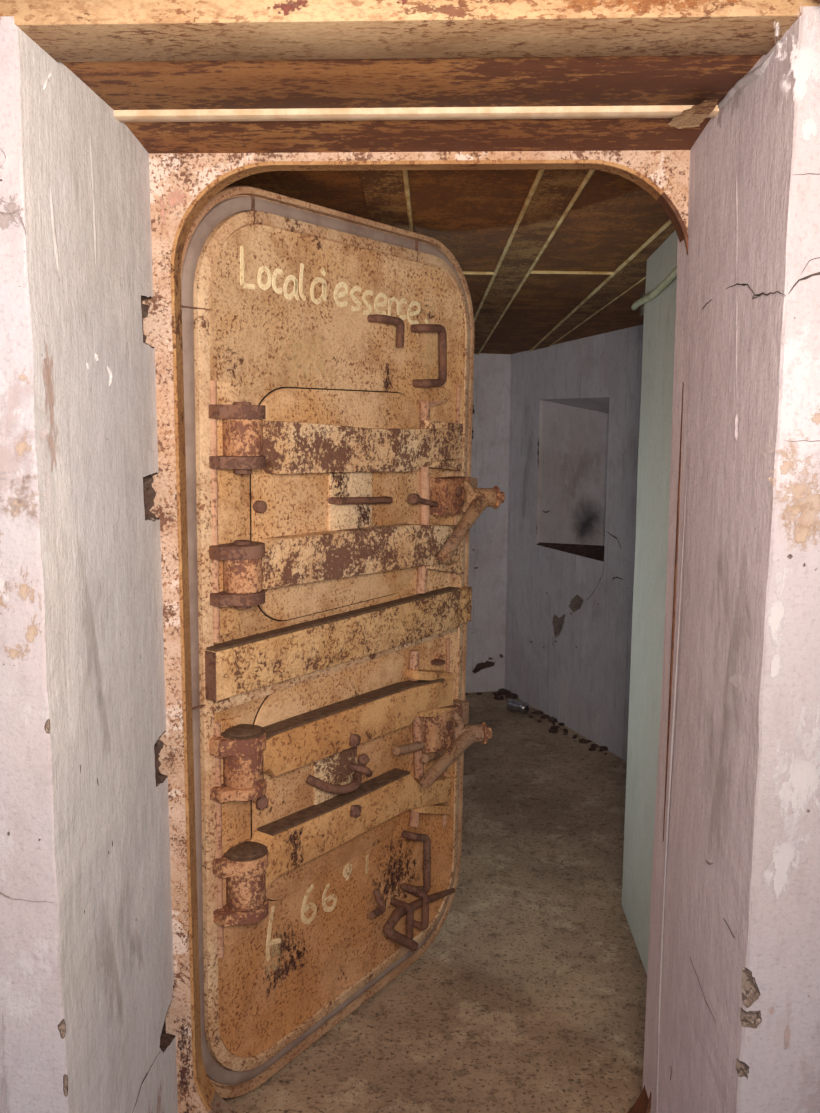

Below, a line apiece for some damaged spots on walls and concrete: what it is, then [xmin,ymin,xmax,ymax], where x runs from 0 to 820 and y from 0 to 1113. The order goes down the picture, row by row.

rust [564,0,710,12]
crack [702,257,820,310]
peeling [768,443,820,678]
peeling [0,553,41,666]
peeling [762,703,820,900]
crack [0,892,47,902]
spalling [739,968,762,1028]
spalling [736,1059,749,1079]